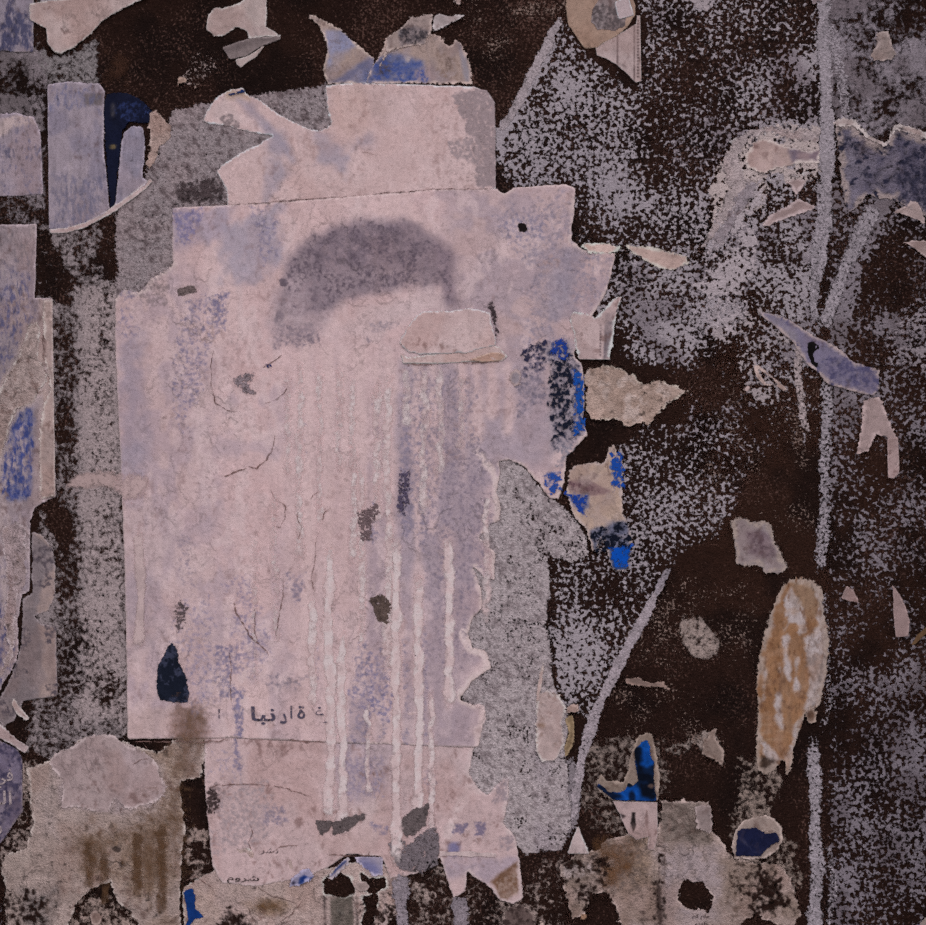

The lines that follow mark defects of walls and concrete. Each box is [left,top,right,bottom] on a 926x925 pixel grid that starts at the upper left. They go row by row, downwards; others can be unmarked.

leakage [482,498,491,618]
leakage [334,368,456,859]
leakage [307,547,349,821]
leakage [133,829,165,910]
leakage [391,874,411,925]
peeling [557,846,610,911]
peeling [732,861,794,918]